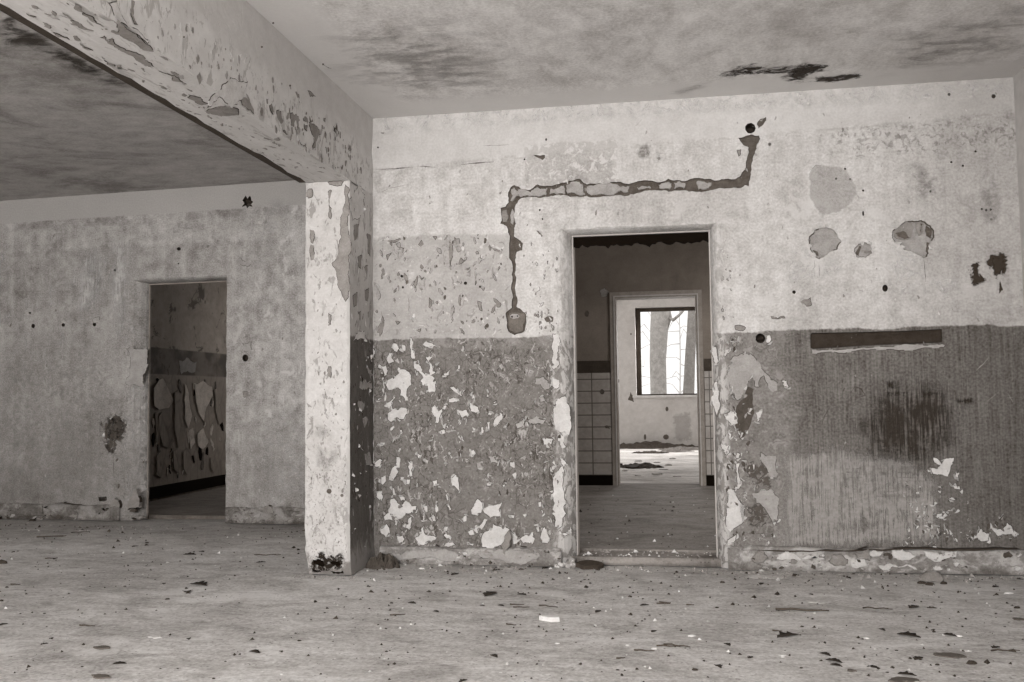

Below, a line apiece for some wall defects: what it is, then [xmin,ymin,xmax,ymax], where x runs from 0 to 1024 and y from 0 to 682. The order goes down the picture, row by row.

damp [721,63,862,82]
peeling [26,0,576,568]
flaking render [808,224,841,259]
flaking render [854,218,934,258]
peeling [710,306,907,573]
damp [785,382,972,546]